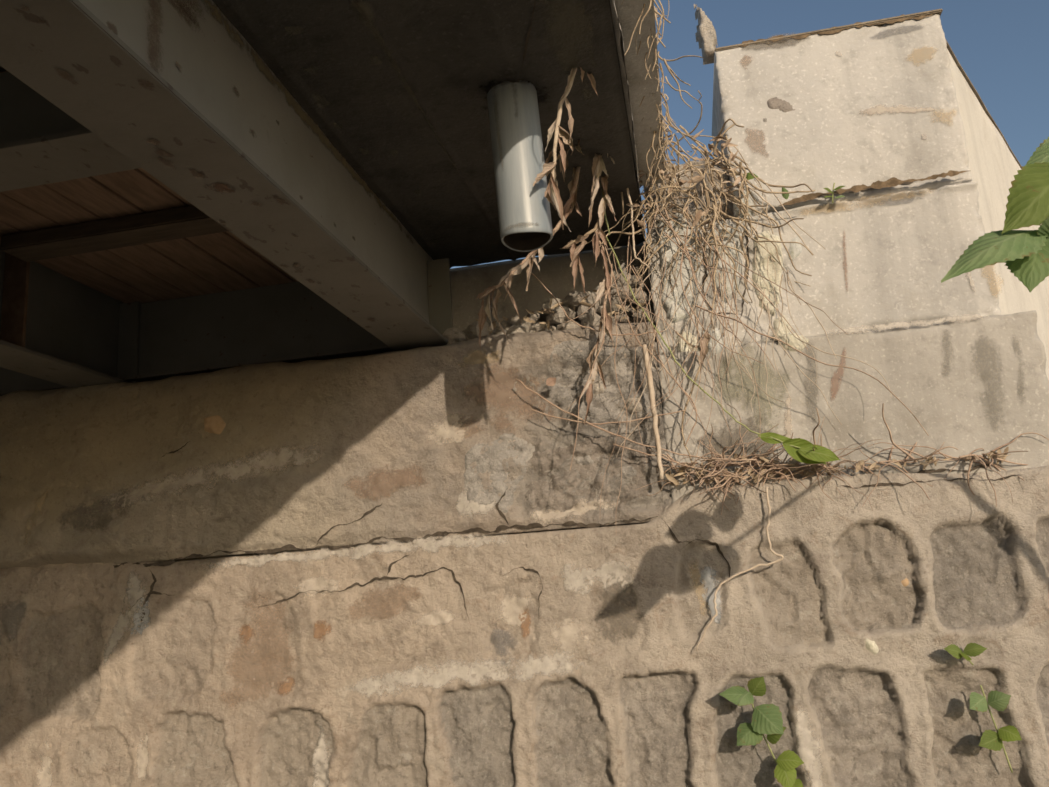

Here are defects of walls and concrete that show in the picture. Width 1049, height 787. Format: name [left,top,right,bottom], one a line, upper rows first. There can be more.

crack [113,460,731,628]
crack [835,464,1024,488]